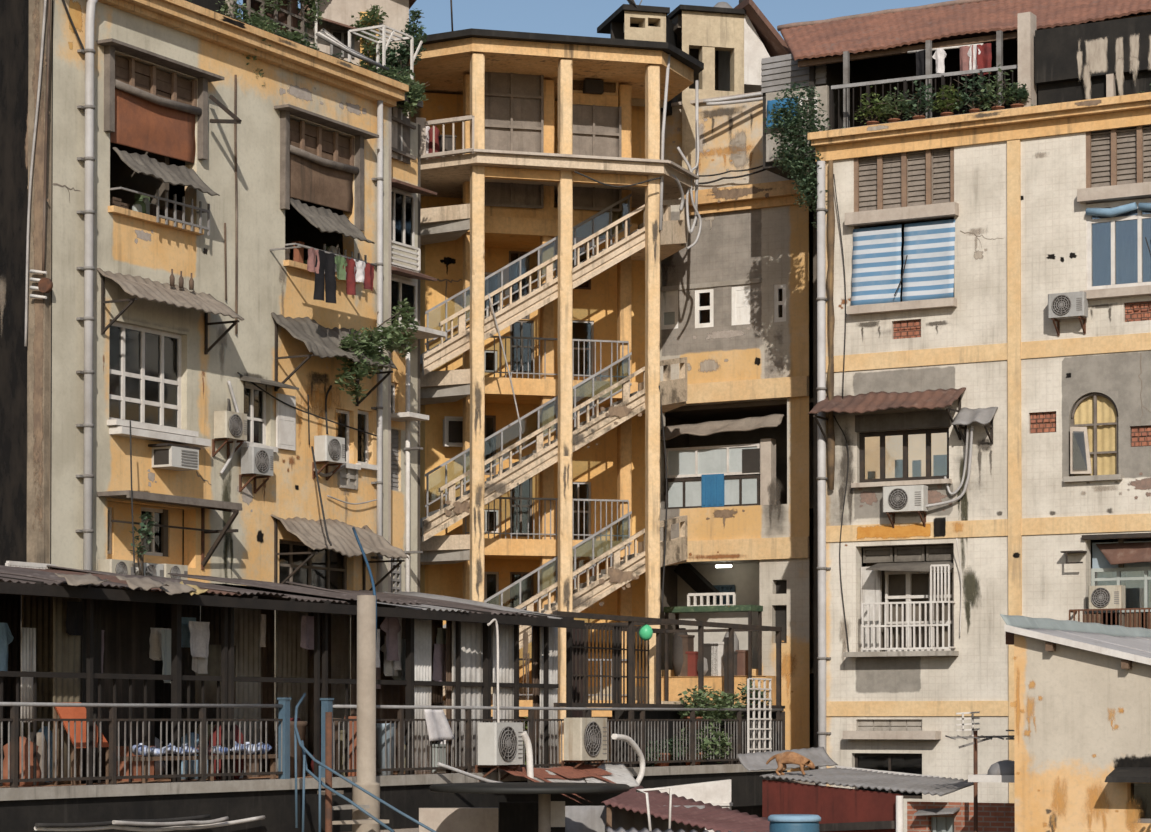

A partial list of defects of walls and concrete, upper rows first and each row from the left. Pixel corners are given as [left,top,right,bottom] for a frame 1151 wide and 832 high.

peeling [1077,34,1151,99]
leakage [704,108,753,133]
leakage [957,459,968,521]
leakage [223,475,233,578]
leakage [961,537,980,627]
leakage [1010,677,1042,736]
leakage [1044,784,1065,832]
leakage [1088,788,1139,831]